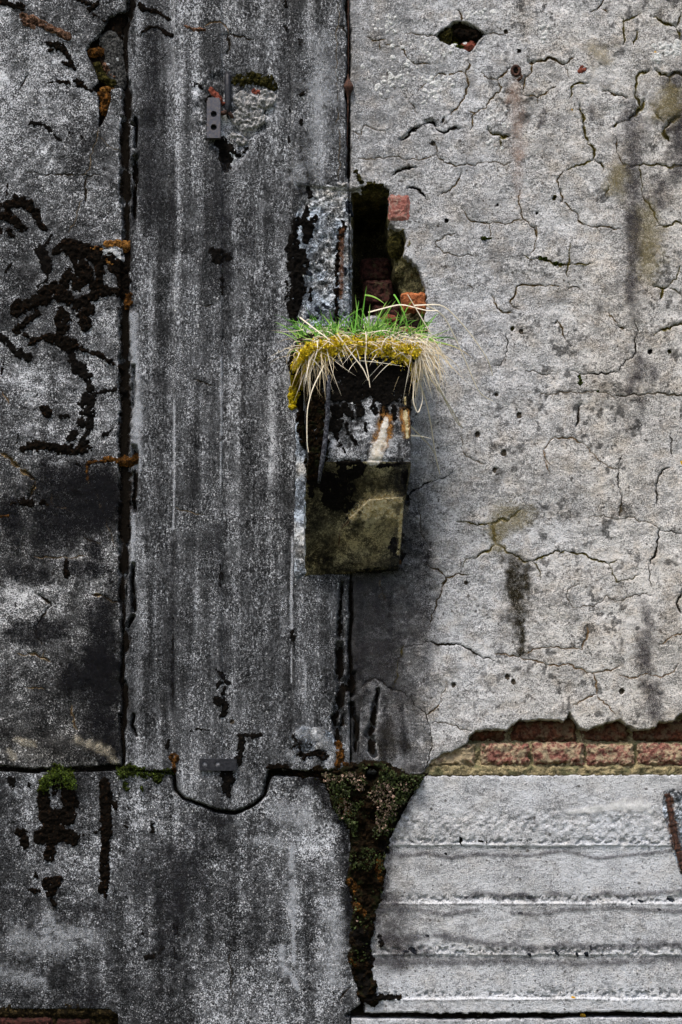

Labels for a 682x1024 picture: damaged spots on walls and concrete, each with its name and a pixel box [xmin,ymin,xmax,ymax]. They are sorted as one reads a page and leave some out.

spalling [438,21,486,52]
spalling [293,182,362,327]
crack [335,0,682,366]
corrosion [85,453,140,481]
crack [331,312,682,769]
water stain [491,507,530,657]
crack [174,771,314,815]
corrosion [664,793,682,873]